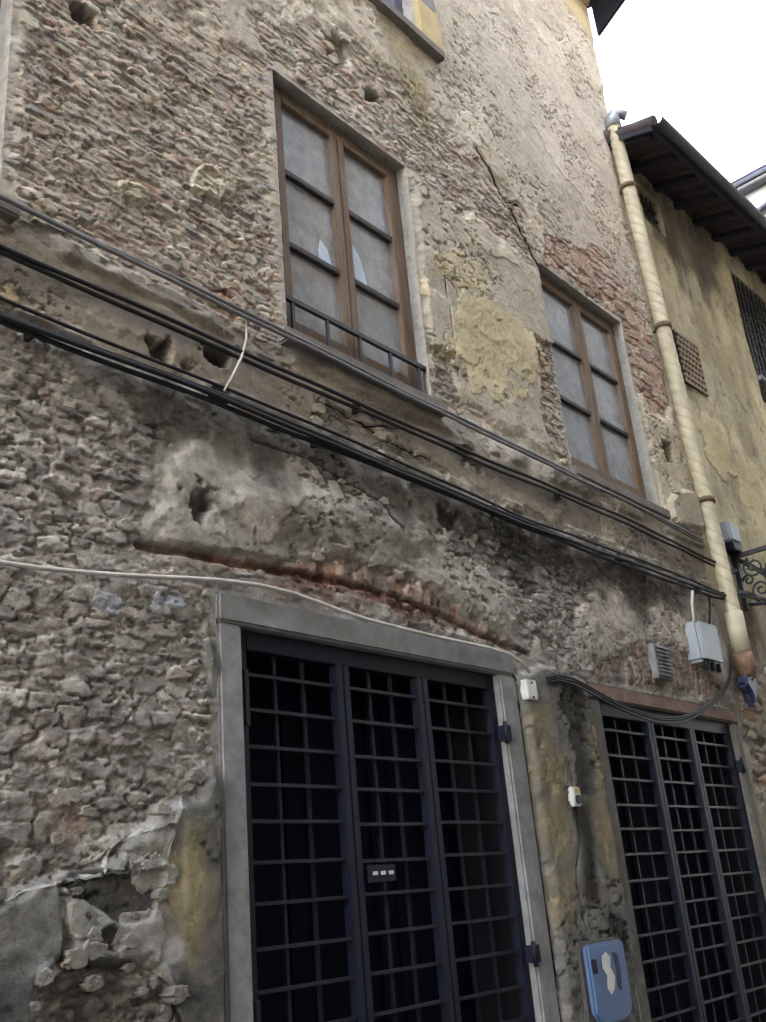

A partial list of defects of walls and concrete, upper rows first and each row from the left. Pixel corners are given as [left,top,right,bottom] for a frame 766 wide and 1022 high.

crack [476,147,539,267]
peeling [418,278,435,300]
peeling [430,248,571,465]
flaking render [542,231,669,421]
flaking render [46,788,97,848]
peeling [56,852,179,974]